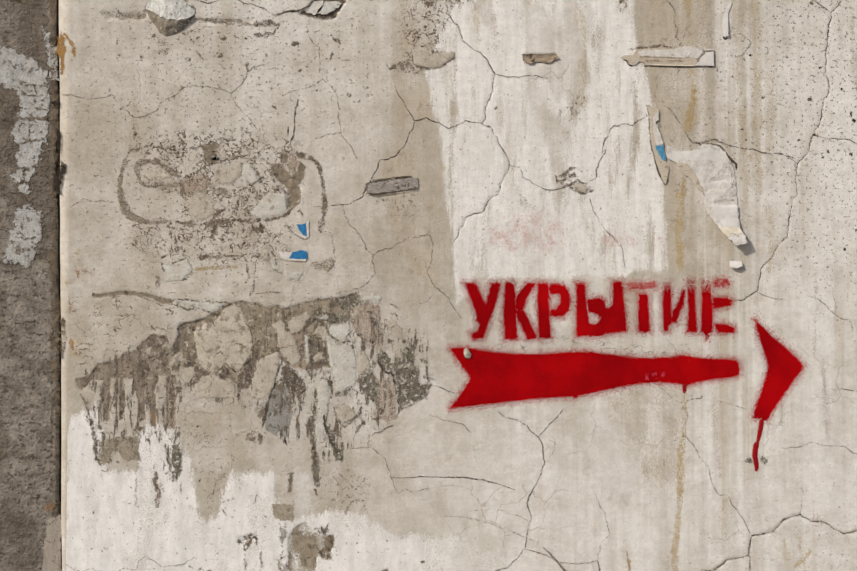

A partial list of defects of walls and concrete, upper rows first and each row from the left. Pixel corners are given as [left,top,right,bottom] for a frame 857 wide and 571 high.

crack [63,64,264,132]
peeling [251,191,288,218]
crack [189,0,355,155]
flaking render [280,99,335,272]
spalling [276,0,348,21]
crack [317,1,568,318]
spalling [523,53,559,64]
crack [584,0,857,327]
peeling [75,242,432,496]
peeling [272,472,339,571]
crack [497,411,610,571]
crack [660,388,857,571]